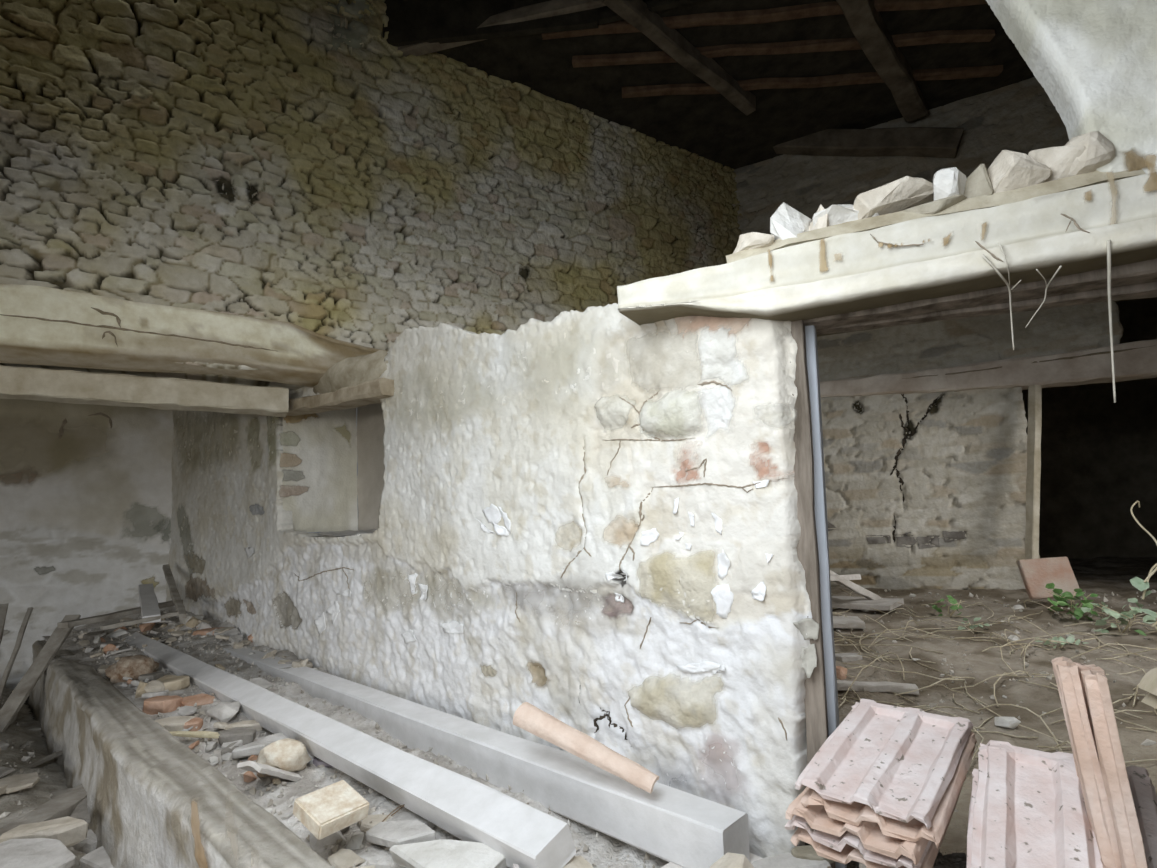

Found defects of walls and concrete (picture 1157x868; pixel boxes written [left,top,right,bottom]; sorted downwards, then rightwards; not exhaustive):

flaking render [755,404,795,427]
crack [560,391,788,579]
flaking render [676,443,697,481]
flaking render [750,443,779,488]
crack [890,393,943,542]
spalling [603,516,659,546]
flaking render [711,549,734,619]